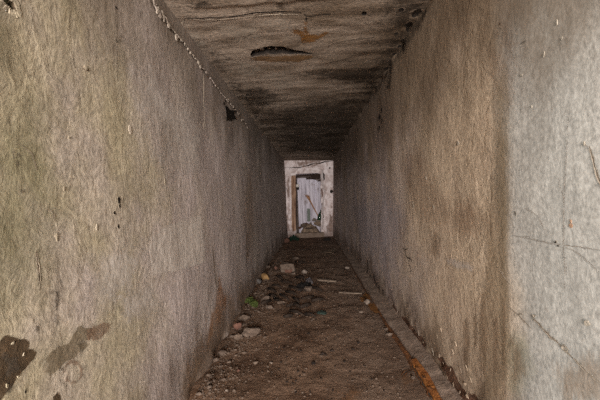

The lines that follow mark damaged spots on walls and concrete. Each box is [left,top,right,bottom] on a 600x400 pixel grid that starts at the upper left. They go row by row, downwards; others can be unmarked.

flaking render [153,0,248,128]
hole [244,43,319,59]
corrosion [294,23,327,43]
crack [517,109,600,290]
corrosion [360,294,442,400]